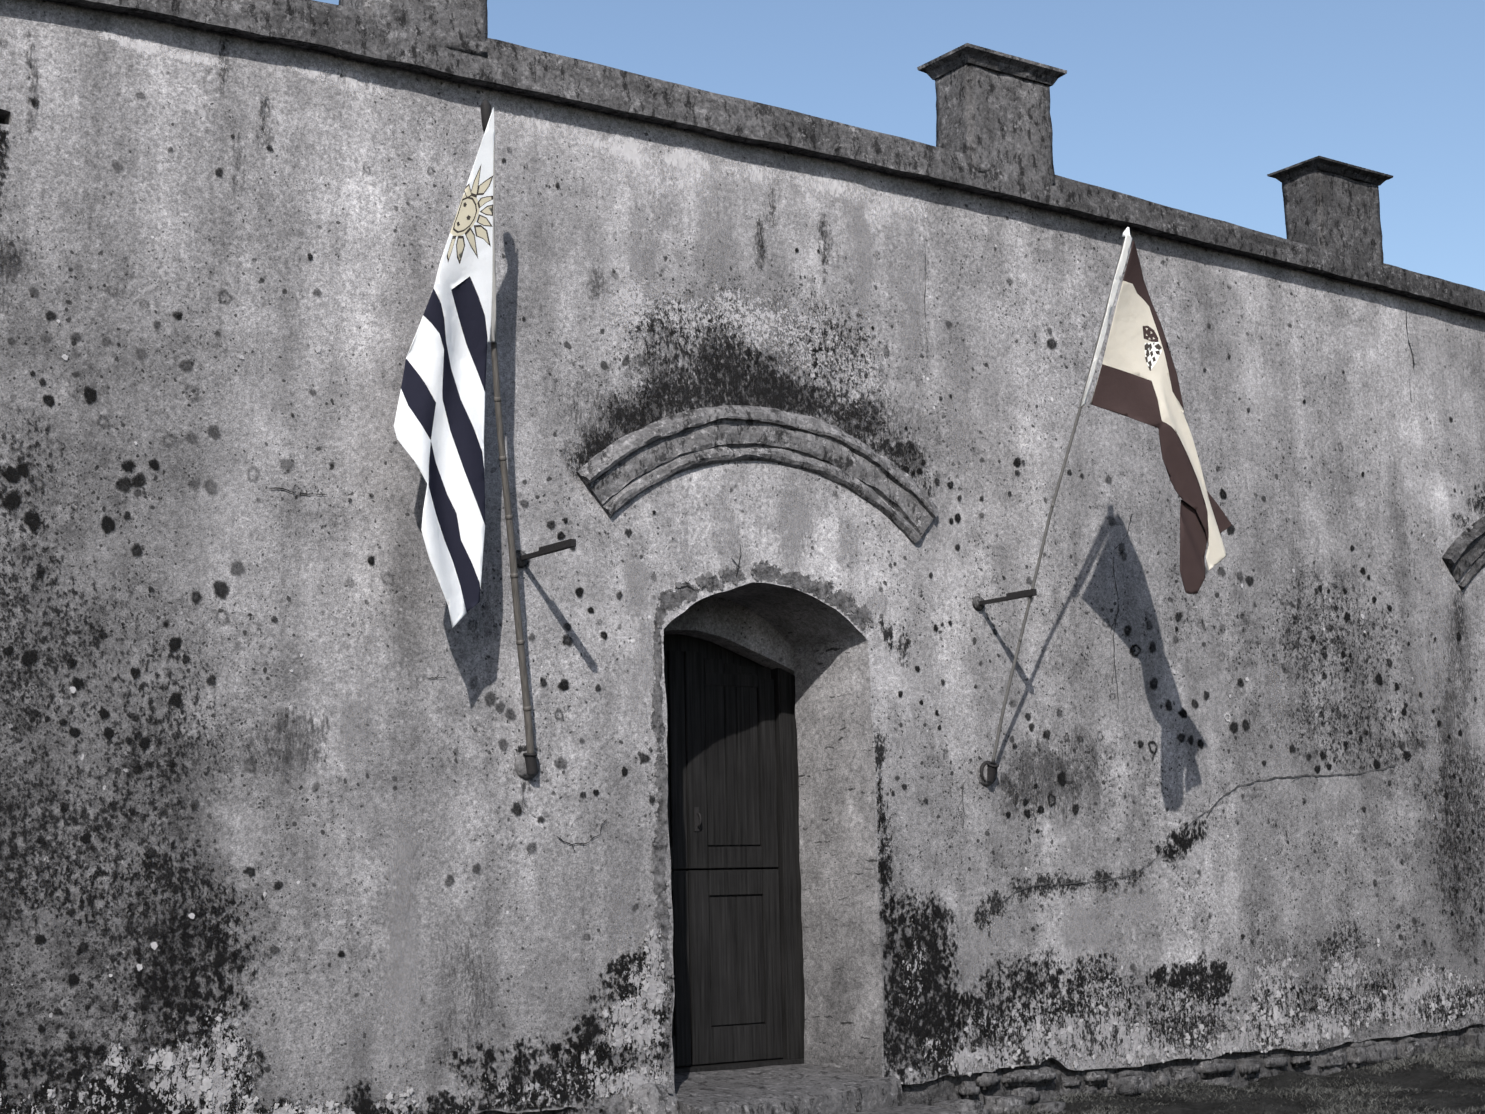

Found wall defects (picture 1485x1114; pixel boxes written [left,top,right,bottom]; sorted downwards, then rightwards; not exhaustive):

leakage [0,126,9,210]
leakage [500,107,935,498]
leakage [0,406,328,1114]
leakage [322,936,674,1114]
leakage [874,729,1485,1084]
crack [979,741,1417,920]
leakage [1268,570,1485,935]